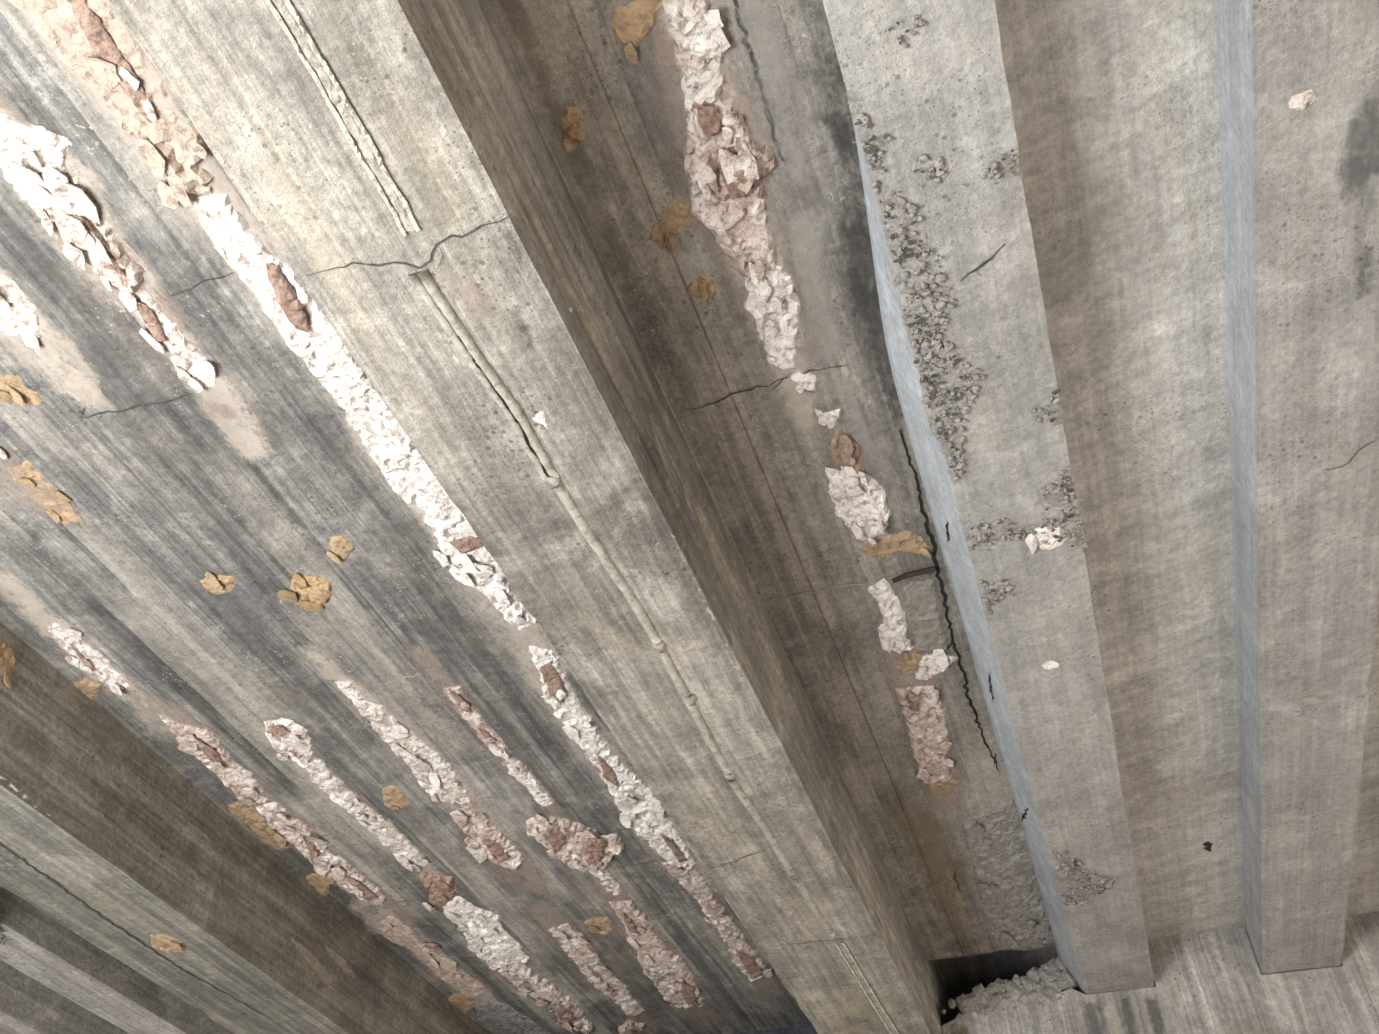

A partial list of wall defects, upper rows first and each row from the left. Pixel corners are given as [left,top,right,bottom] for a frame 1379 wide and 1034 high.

spalling [0,0,786,1034]
crack [285,216,509,277]
crack [681,365,847,411]
spalling [610,0,1055,949]
crack [899,430,999,771]